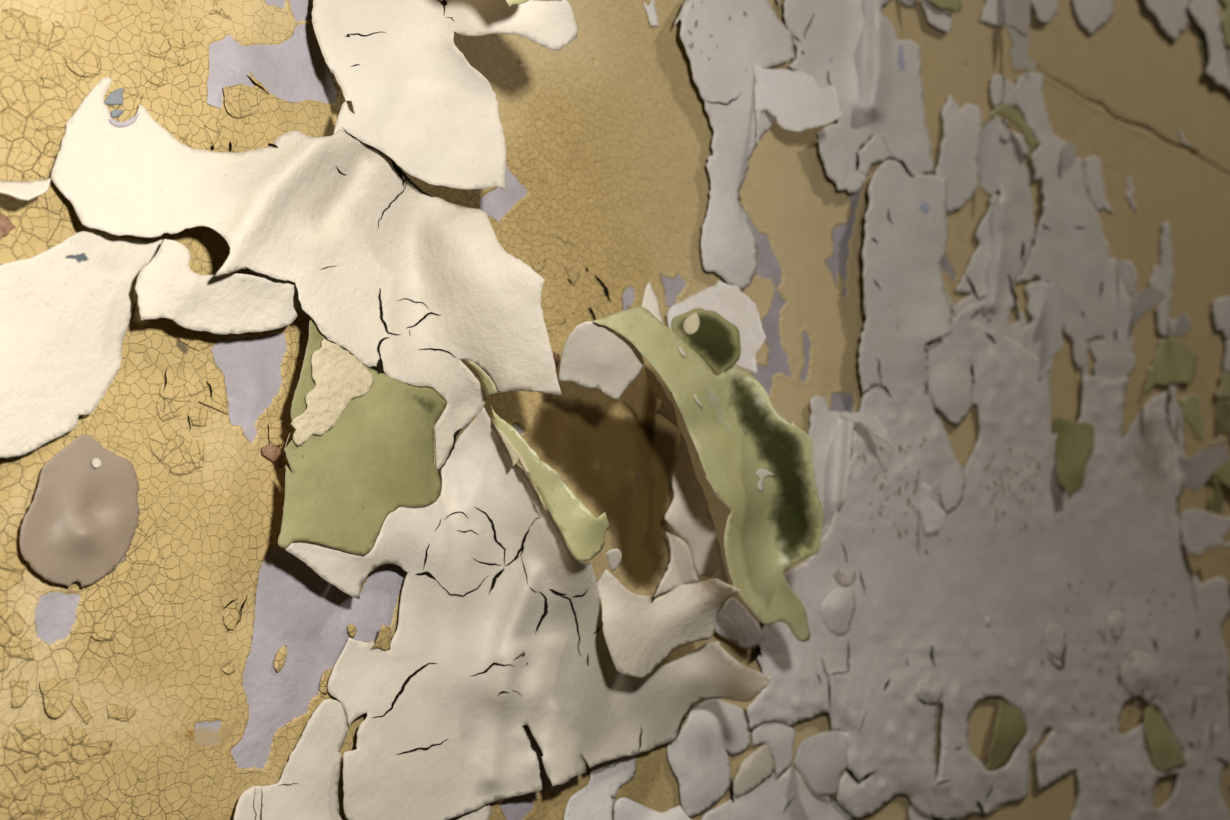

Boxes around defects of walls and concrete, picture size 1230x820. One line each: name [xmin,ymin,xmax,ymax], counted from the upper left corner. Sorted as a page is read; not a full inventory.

crack [1037,68,1230,174]
peeling [0,0,578,769]
peeling [233,0,934,820]
peeling [701,0,1230,820]
crack [223,597,247,632]
peeling [0,676,113,820]
crack [253,783,298,820]